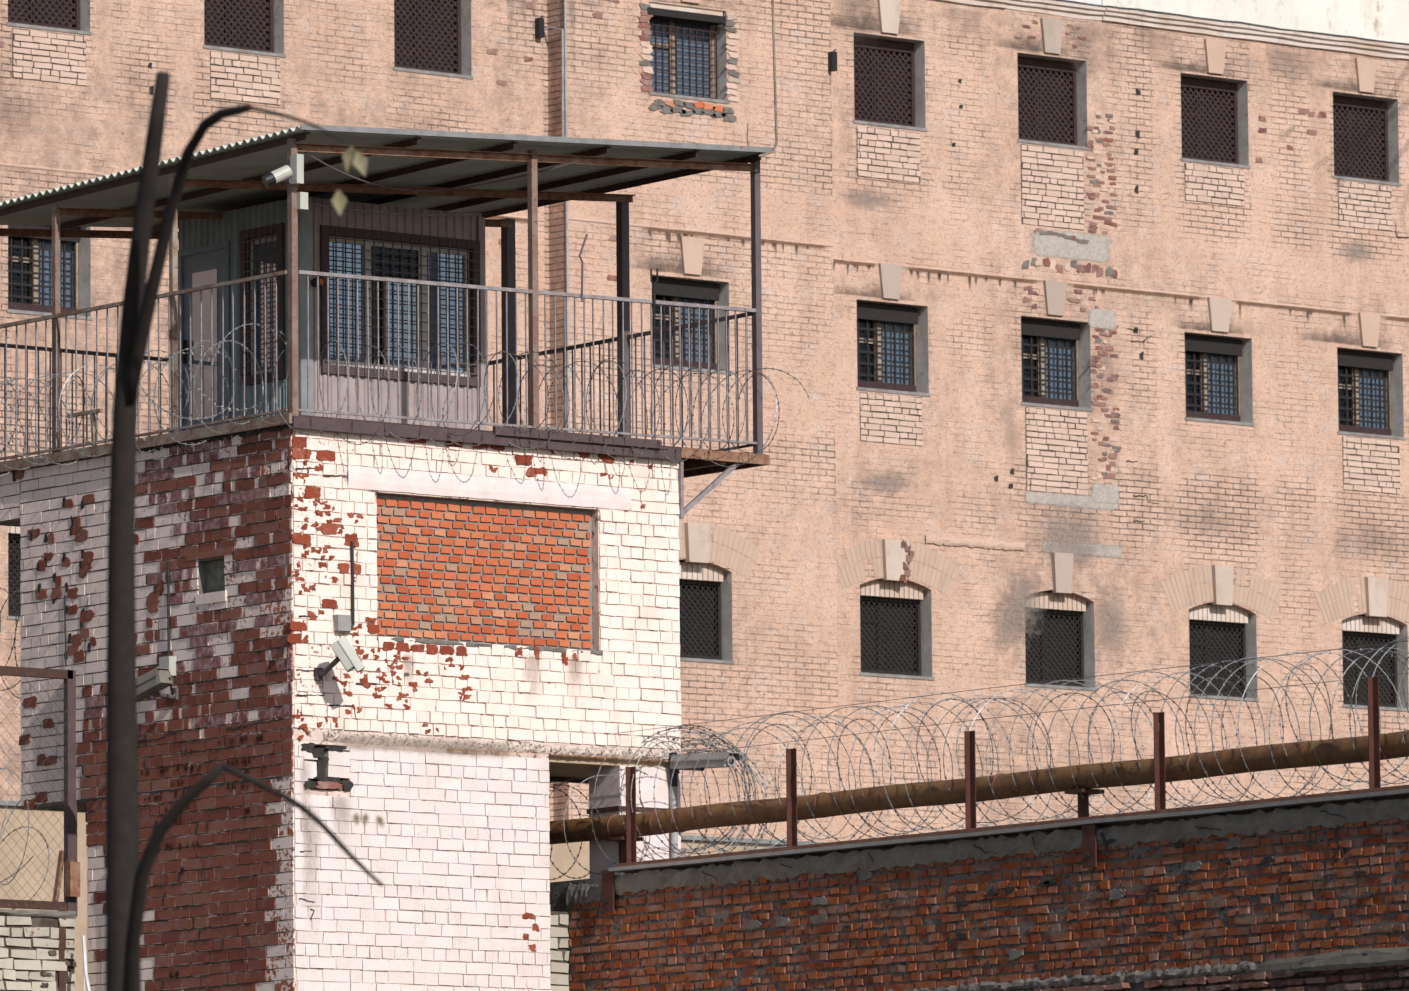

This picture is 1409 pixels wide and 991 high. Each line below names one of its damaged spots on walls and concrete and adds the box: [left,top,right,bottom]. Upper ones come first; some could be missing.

spalling [637,3,741,122]
flaking render [1021,111,1139,244]
flaking render [994,257,1138,504]
peeling [12,469,25,481]
peeling [27,494,97,663]
spalling [899,540,914,583]
peeling [19,696,58,766]
peeling [135,425,473,991]
peeling [23,791,48,810]
peeling [93,892,106,913]
spalling [40,950,77,987]
peeling [94,950,106,961]